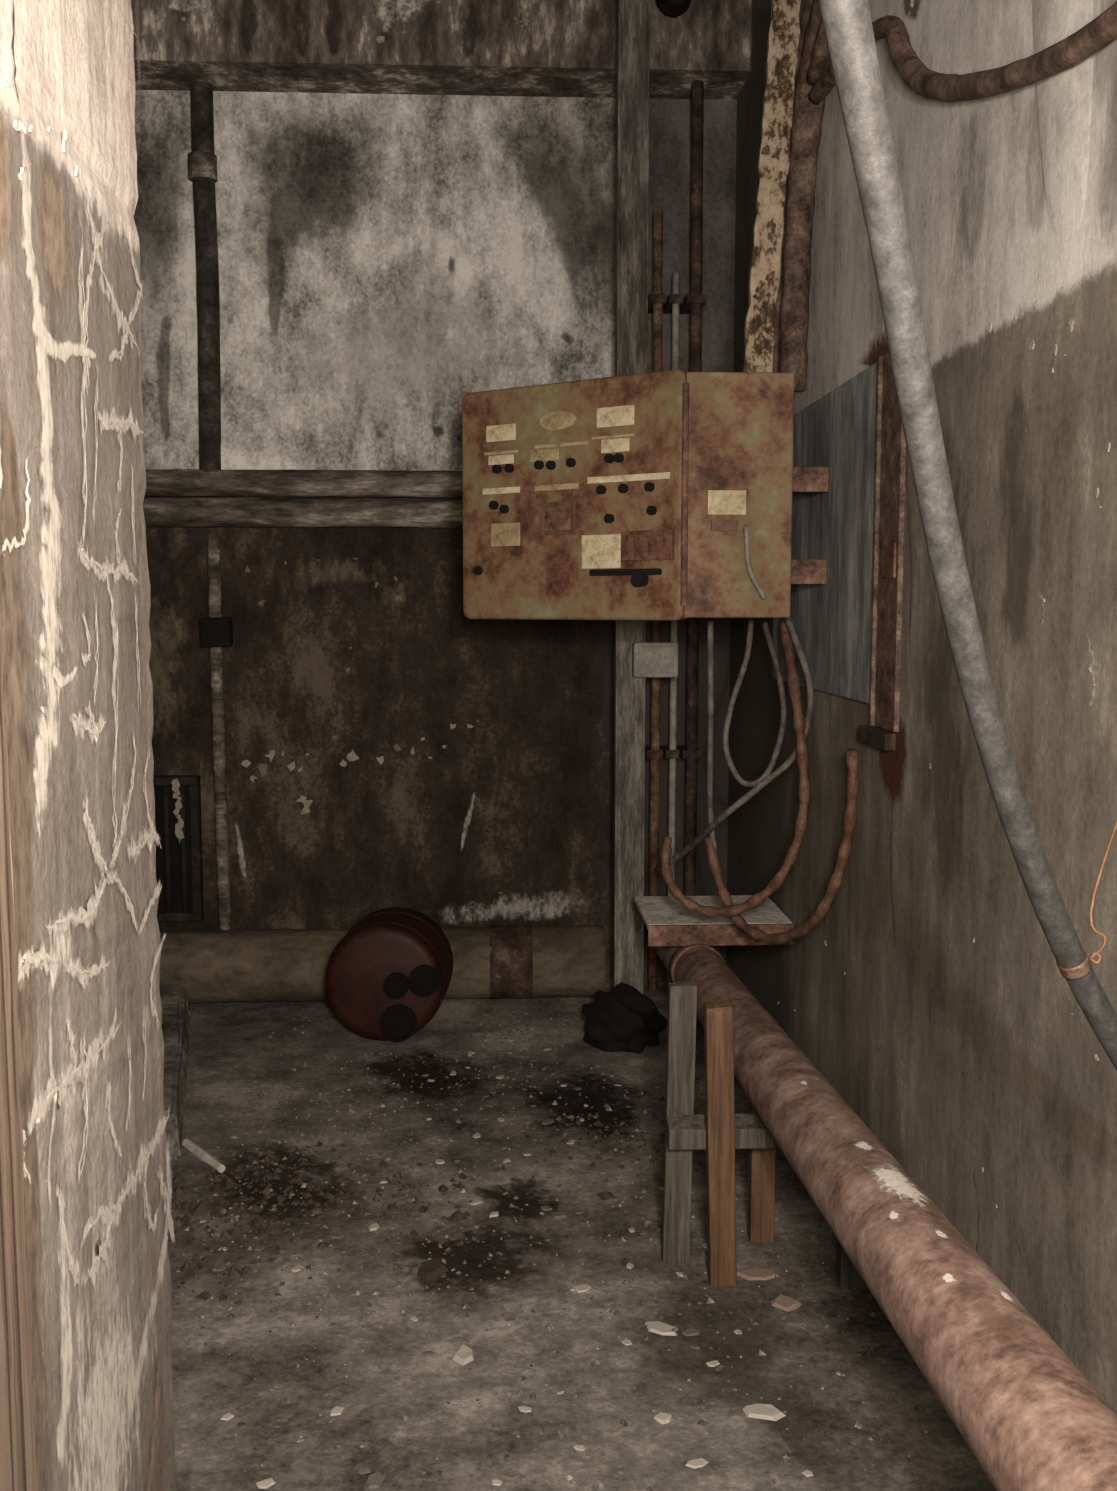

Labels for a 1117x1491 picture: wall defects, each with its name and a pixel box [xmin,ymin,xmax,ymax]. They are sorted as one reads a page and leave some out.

crack [12,1,21,106]
leakage [262,130,357,249]
crack [17,179,175,1287]